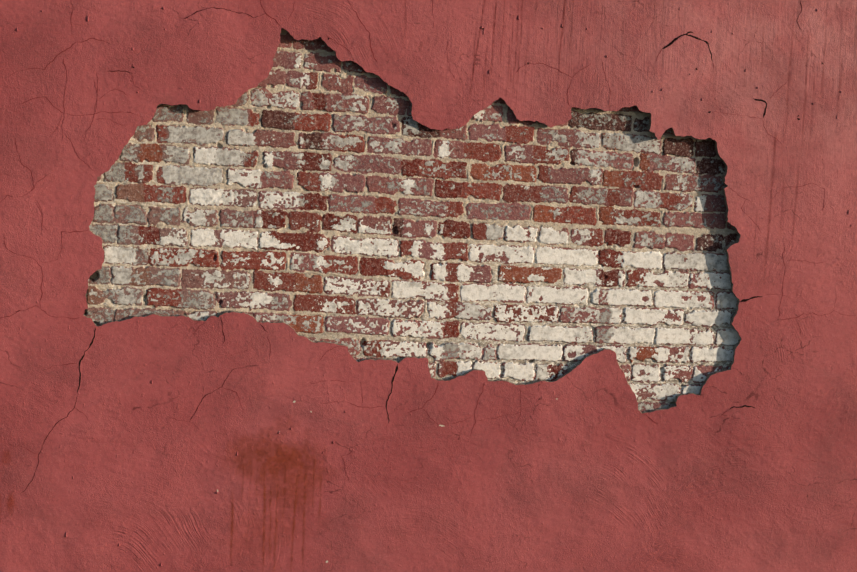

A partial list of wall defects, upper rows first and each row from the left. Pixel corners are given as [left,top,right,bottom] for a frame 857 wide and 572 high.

crack [11,4,141,173]
crack [183,0,295,26]
crack [656,31,714,68]
spalling [84,28,742,414]
crack [1,139,96,492]
crack [312,346,521,436]